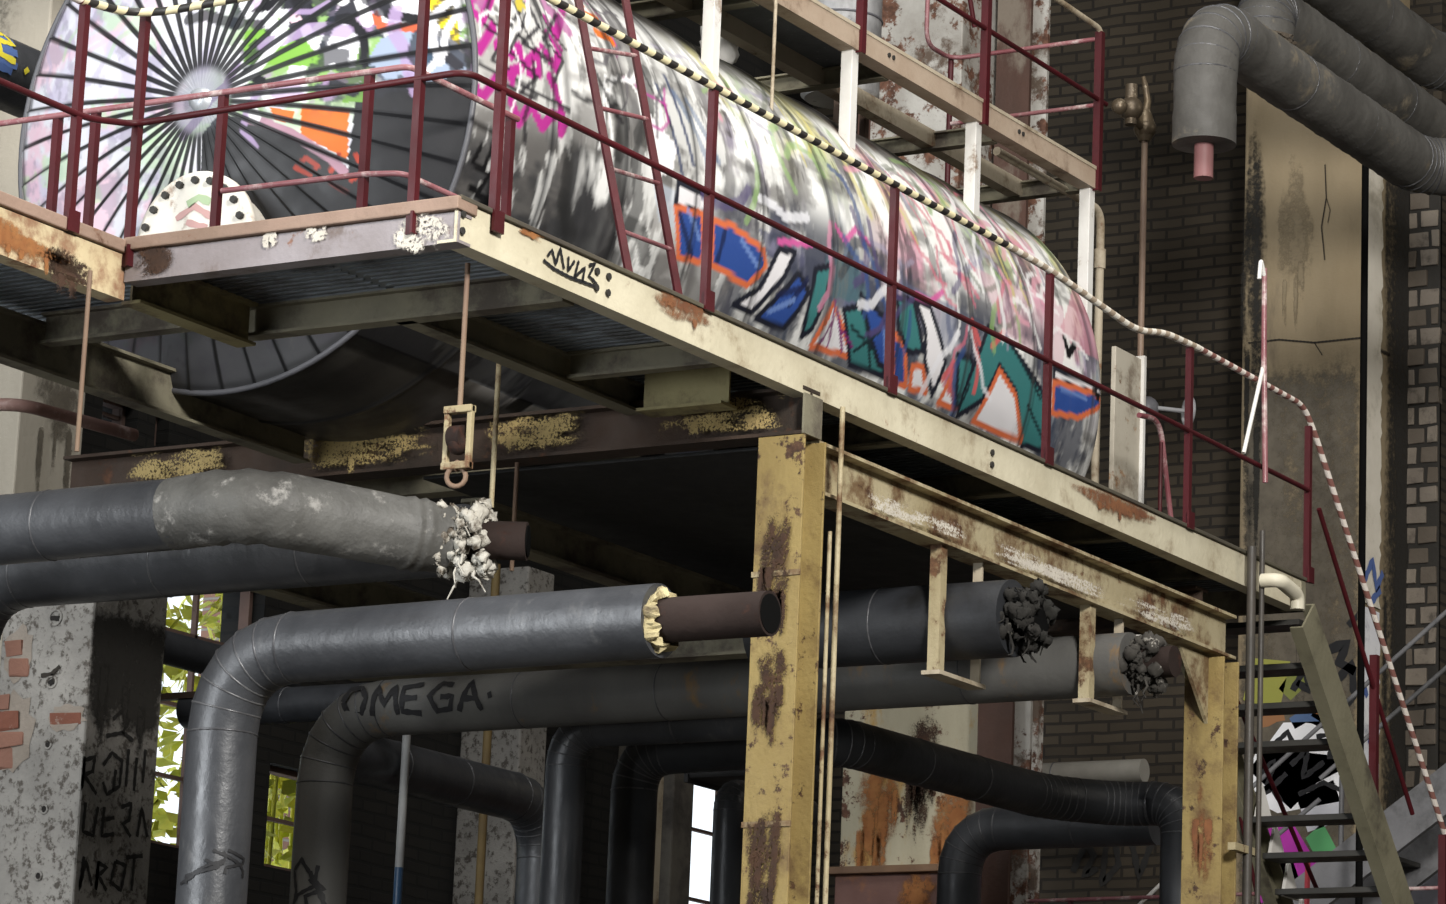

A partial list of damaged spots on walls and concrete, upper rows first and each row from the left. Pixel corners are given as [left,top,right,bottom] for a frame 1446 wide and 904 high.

corrosion [0,217,93,299]
leakage [1278,173,1313,323]
corrosion [751,513,791,743]
corrosion [912,715,938,743]
corrosion [746,811,781,904]
corrosion [856,774,972,904]
corrosion [1192,787,1213,877]